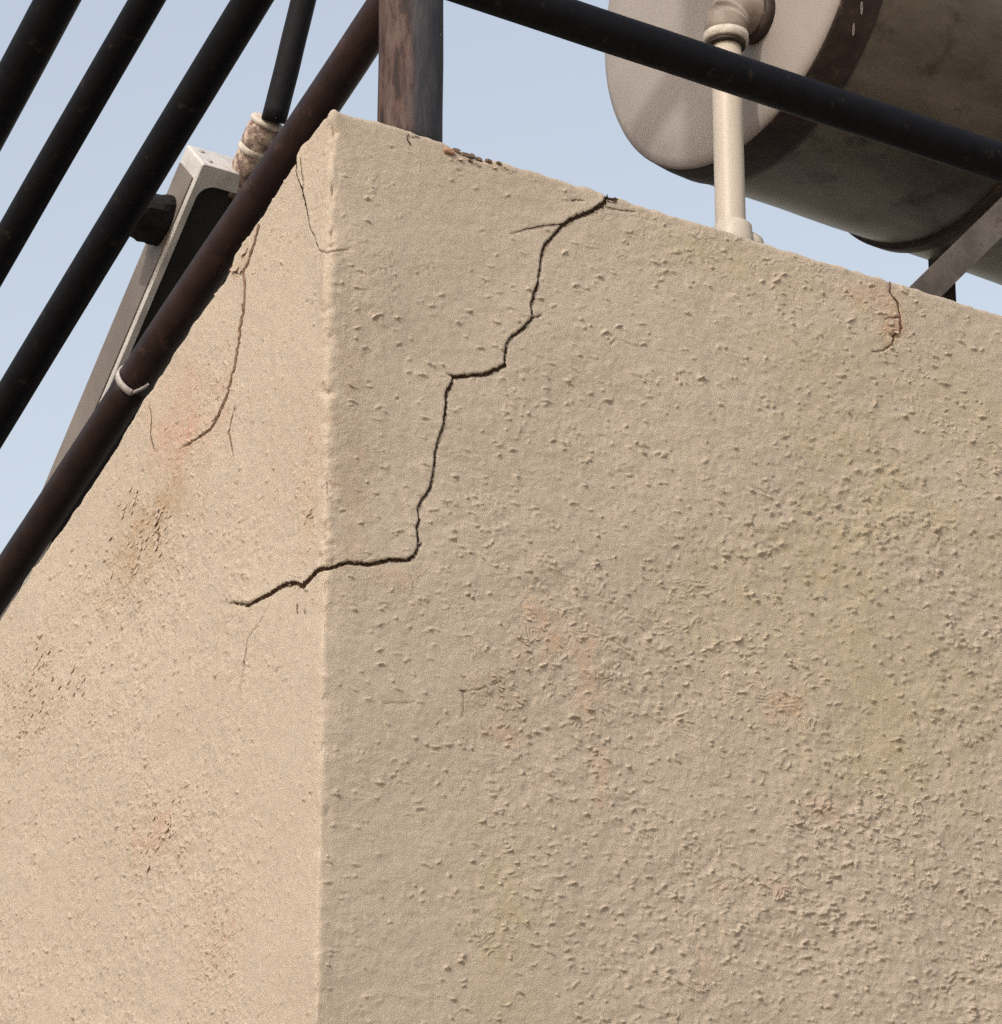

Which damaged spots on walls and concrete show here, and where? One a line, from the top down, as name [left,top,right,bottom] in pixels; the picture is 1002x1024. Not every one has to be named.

crack [185,224,260,455]
crack [296,157,342,253]
crack [234,194,635,687]
crack [872,282,903,352]